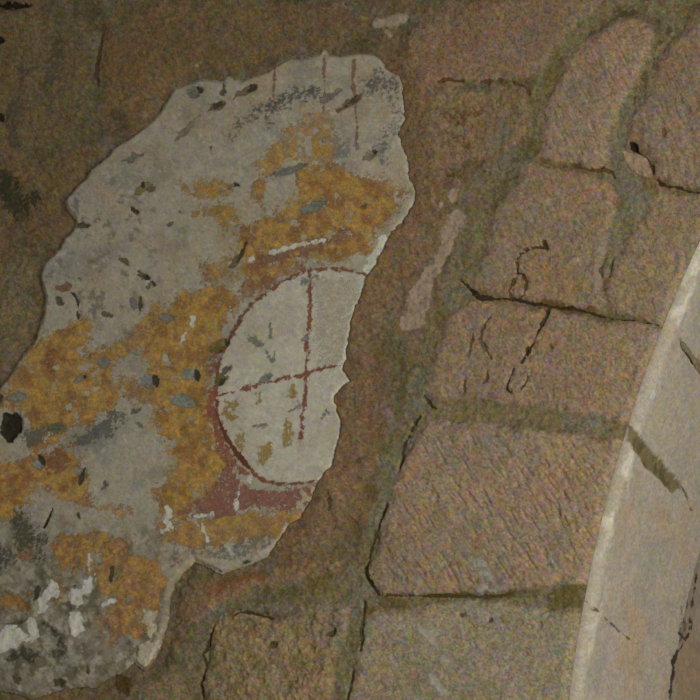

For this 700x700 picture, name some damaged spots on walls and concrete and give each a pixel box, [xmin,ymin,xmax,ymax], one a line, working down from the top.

crack [636,152,700,194]
crack [461,240,659,397]
peeling [0,553,97,654]
peeling [137,607,163,668]
crack [669,574,698,699]